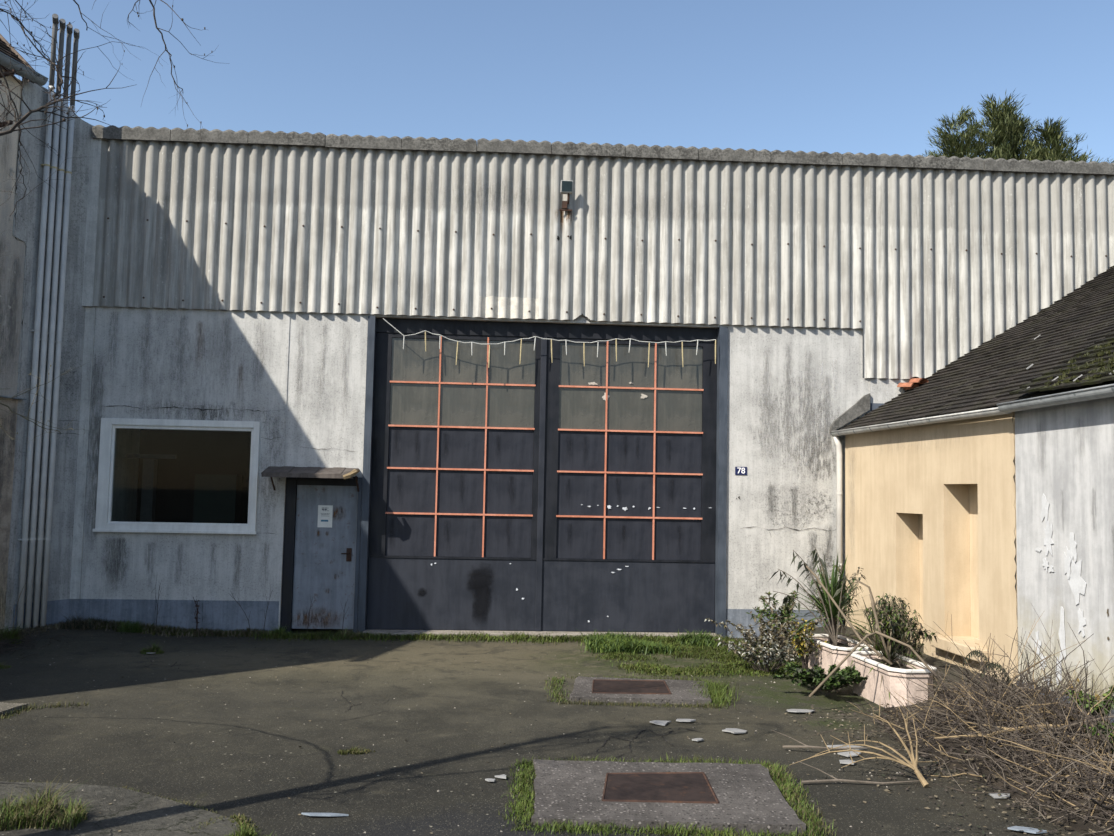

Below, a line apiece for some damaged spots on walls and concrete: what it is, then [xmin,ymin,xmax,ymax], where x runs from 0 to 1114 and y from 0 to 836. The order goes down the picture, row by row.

damp [761,376,835,466]
peeling [1035,493,1086,695]